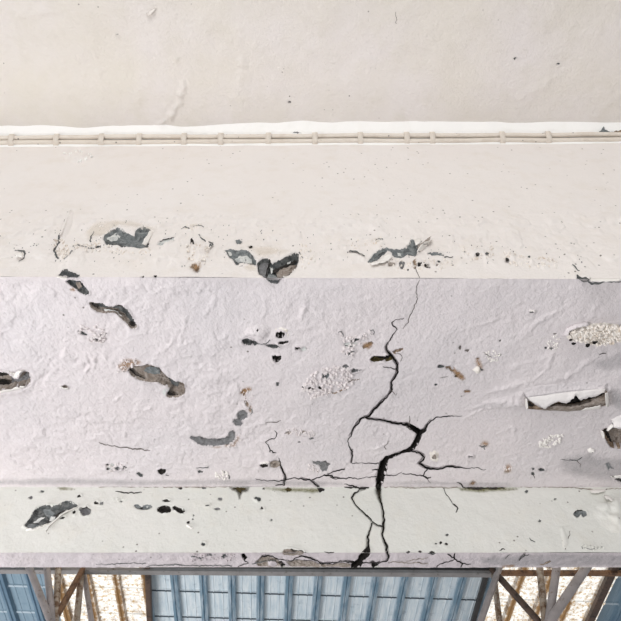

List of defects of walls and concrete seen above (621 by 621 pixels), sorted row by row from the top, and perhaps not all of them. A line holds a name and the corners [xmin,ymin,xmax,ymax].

spalling [51,222,153,262]
spalling [224,234,332,284]
spalling [346,235,453,271]
spalling [57,269,89,295]
spalling [89,302,137,329]
peeling [240,323,289,362]
spalling [117,358,185,398]
peeling [475,382,620,412]
peeling [190,410,247,448]
crack [96,267,486,569]
peeling [600,415,621,442]
spalling [25,495,103,532]